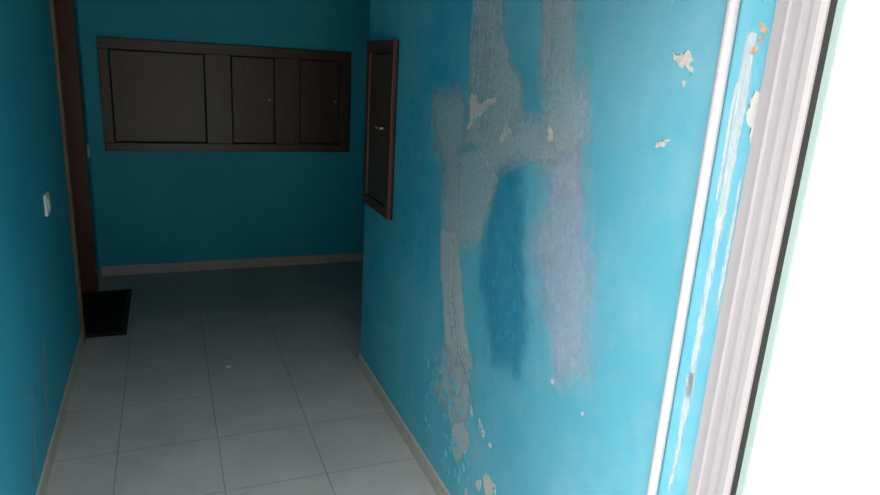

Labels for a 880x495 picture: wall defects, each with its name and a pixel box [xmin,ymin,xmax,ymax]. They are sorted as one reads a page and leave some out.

peeling [672,50,694,87]
peeling [466,92,496,131]
peeling [746,91,760,143]